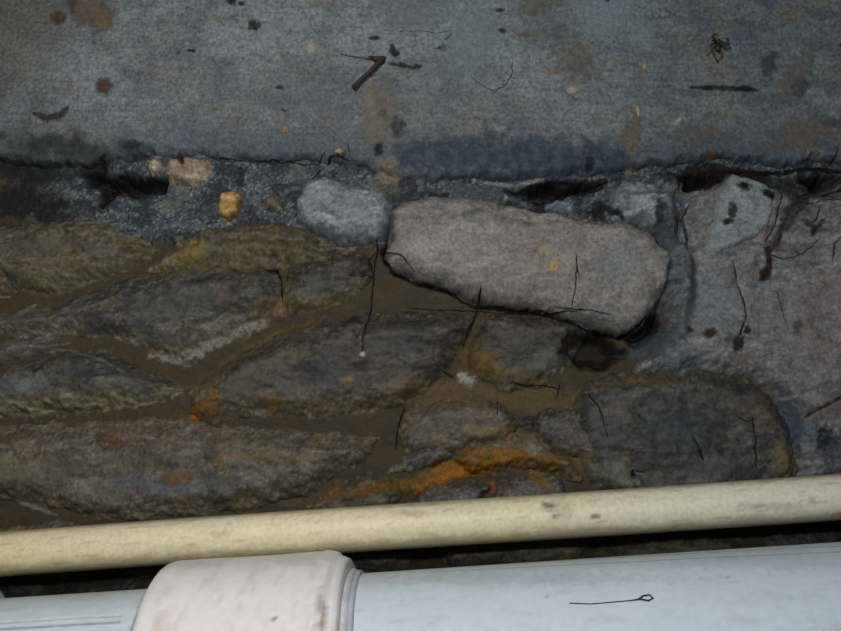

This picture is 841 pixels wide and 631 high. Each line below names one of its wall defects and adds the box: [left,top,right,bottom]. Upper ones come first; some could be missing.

damp [33,106,68,122]
crack [680,205,689,249]
crack [709,144,841,263]
crack [359,239,677,359]
crack [732,260,747,336]
crack [496,382,560,416]
crack [588,393,608,438]
crack [736,415,757,469]
crack [802,396,841,419]
rust [326,445,559,500]